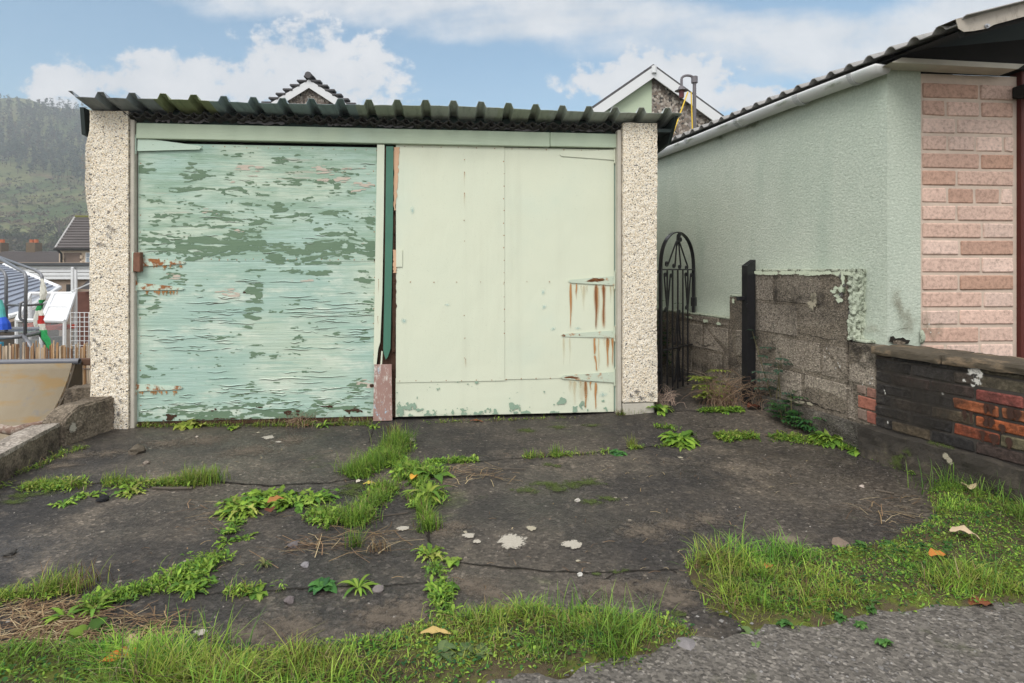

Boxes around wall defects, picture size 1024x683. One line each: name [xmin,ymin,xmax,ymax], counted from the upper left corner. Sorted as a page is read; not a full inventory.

peeling [139,146,375,369]
rust [562,278,614,408]
peeling [139,378,373,420]
peeling [396,380,531,416]
peeling [550,397,588,413]
crack [196,586,310,594]
crack [336,530,677,608]